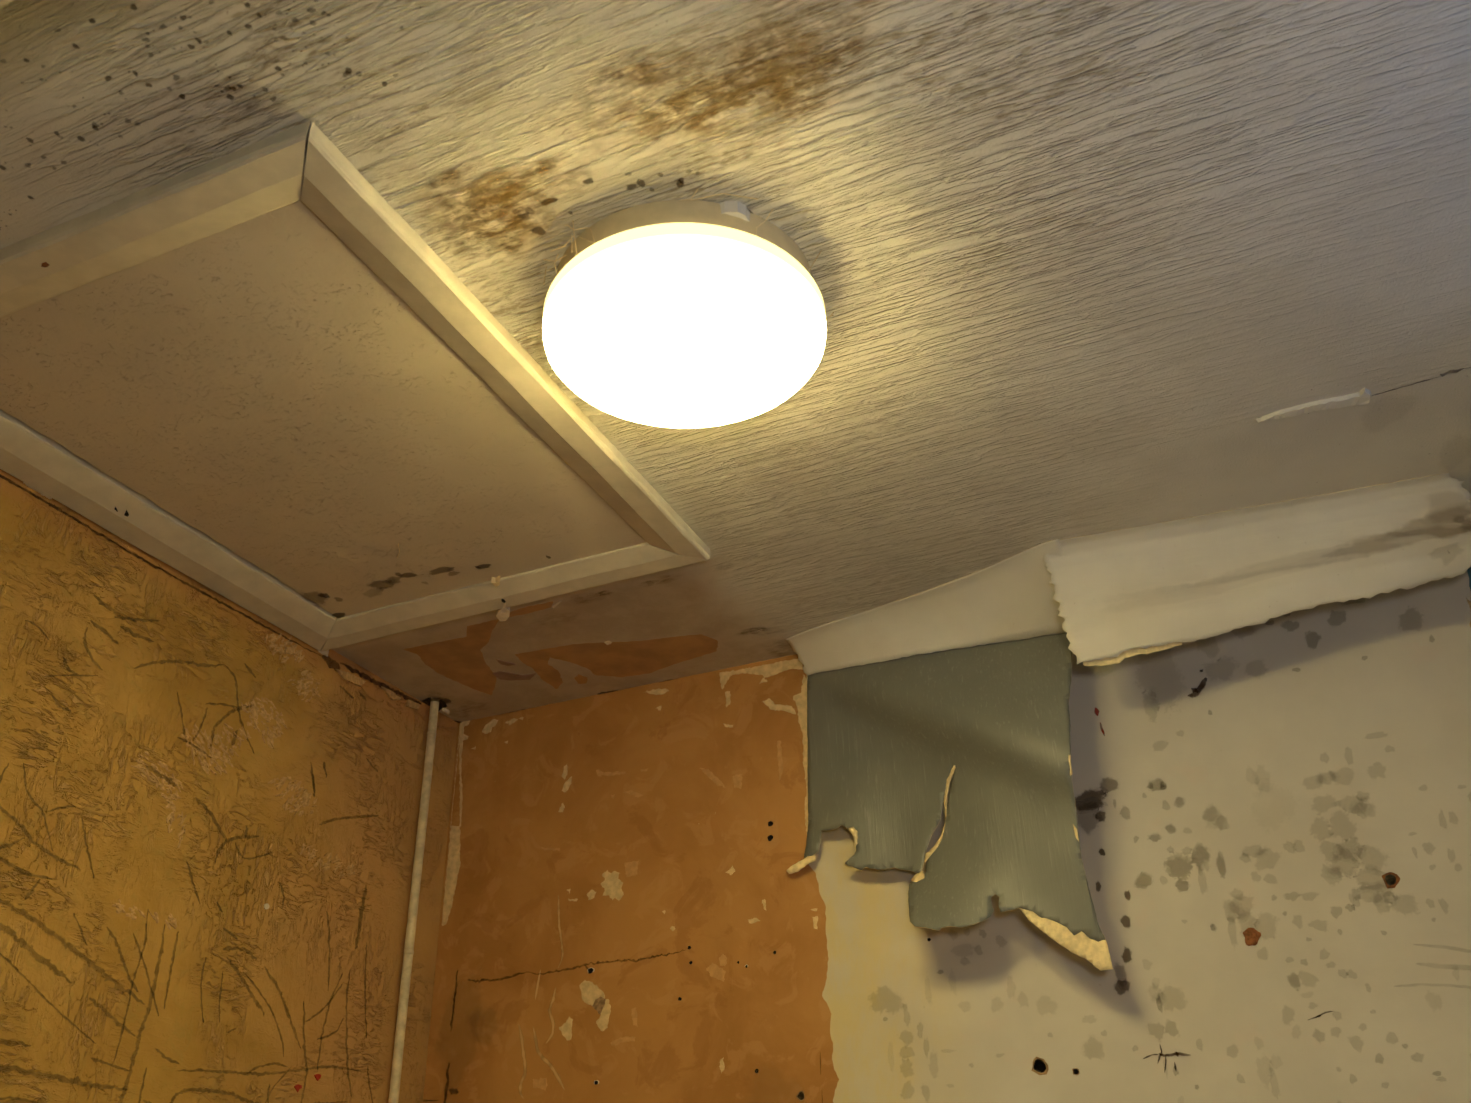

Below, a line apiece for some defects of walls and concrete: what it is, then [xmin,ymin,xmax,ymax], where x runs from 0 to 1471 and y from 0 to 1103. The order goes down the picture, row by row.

damp [626,173,684,190]
peeling [403,599,553,695]
peeling [515,634,718,711]
spalling [719,659,803,728]
damp [1075,790,1106,821]
spalling [567,870,624,901]
damp [1121,890,1131,927]
crack [434,895,684,1098]
spalling [579,967,611,1031]
damp [1115,981,1130,995]
spalling [559,1017,573,1041]
crack [425,1063,459,1103]